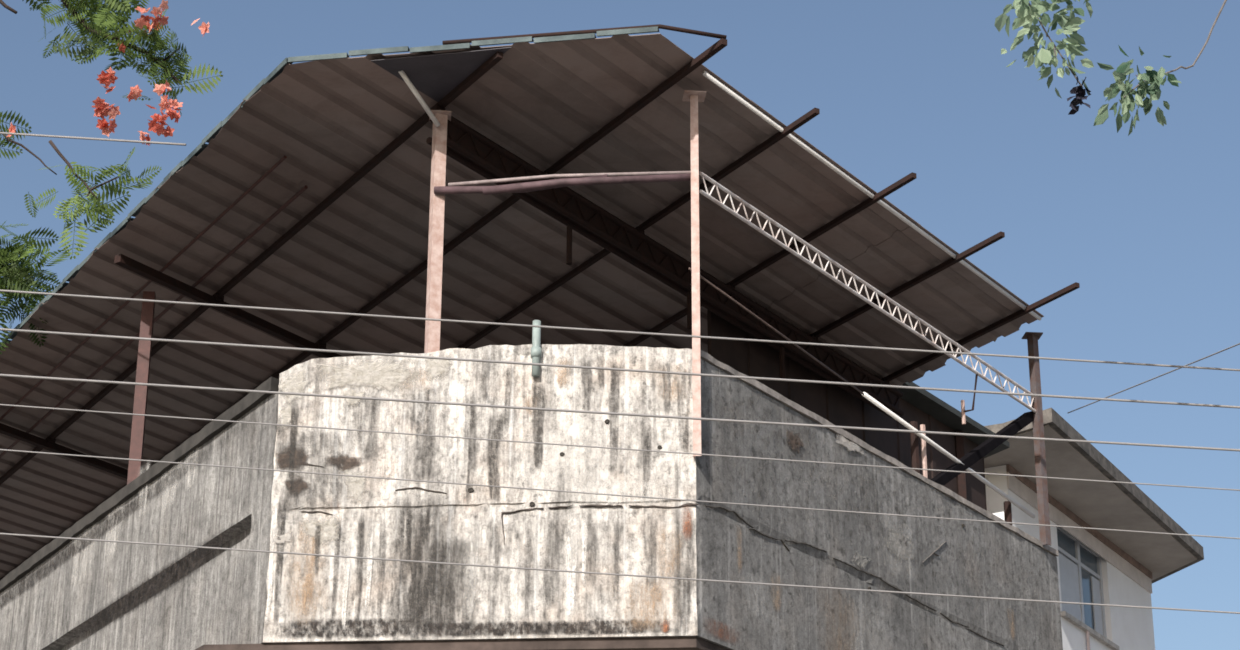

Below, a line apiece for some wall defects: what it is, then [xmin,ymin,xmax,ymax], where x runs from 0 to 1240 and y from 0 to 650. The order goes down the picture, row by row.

water stain [266,408,341,619]
crack [395,486,447,494]
water stain [413,393,433,477]
water stain [466,369,510,499]
water stain [533,386,582,479]
water stain [582,363,621,453]
water stain [641,427,657,501]
water stain [667,369,690,449]
water stain [332,503,475,627]
water stain [548,519,596,615]
crack [501,503,1004,646]